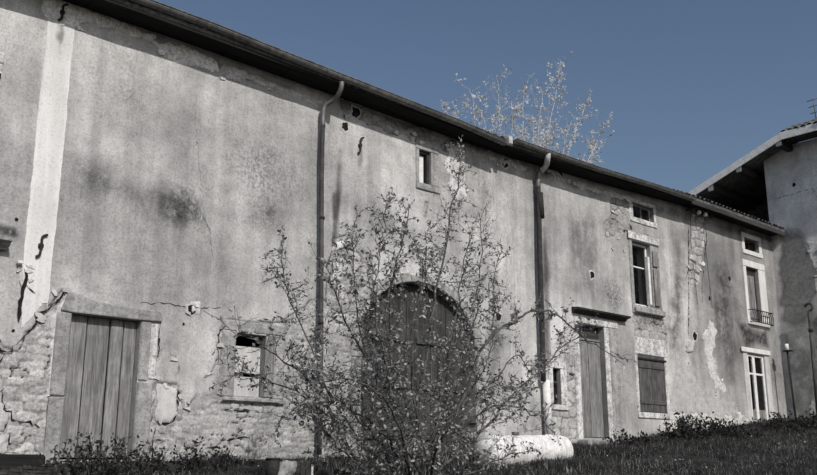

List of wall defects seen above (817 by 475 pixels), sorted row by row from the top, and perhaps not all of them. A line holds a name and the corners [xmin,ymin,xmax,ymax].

peeling [42,0,323,106]
water stain [780,232,817,325]
peeling [807,241,817,292]
crack [141,302,226,362]
peeling [185,301,201,317]
crack [152,389,180,454]
peeling [155,371,223,425]
crack [194,436,250,454]
peeling [667,321,752,431]